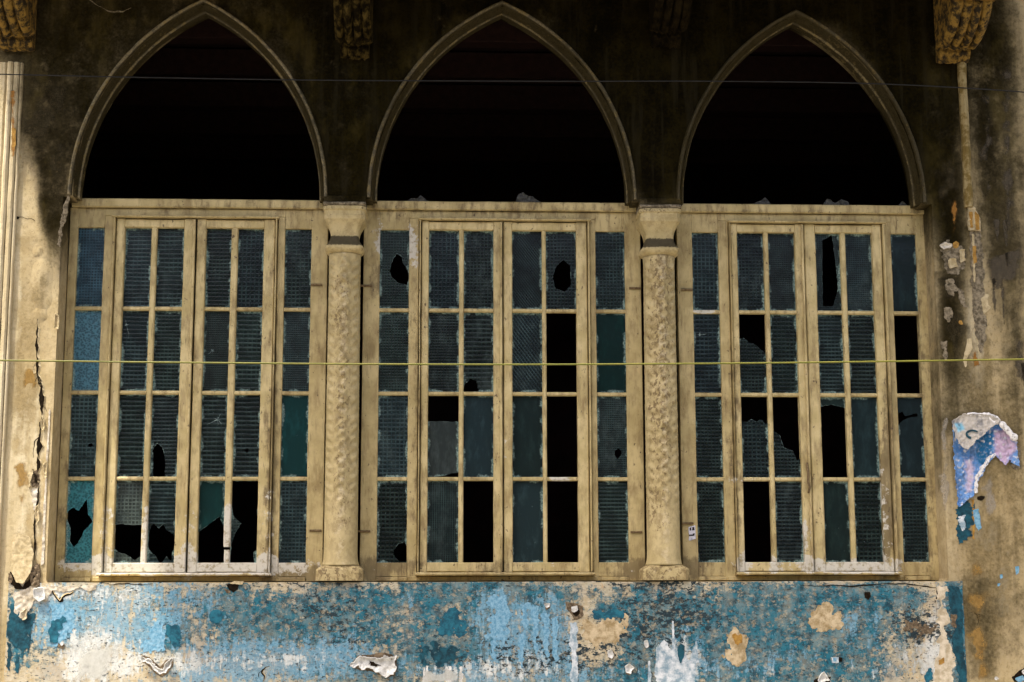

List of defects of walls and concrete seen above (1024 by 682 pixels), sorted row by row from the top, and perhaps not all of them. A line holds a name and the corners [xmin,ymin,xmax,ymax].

leakage [988,169,1023,317]
spalling [939,206,990,367]
crack [33,319,46,474]
peeling [140,620,182,677]
peeling [349,652,397,678]
peeling [418,606,468,667]
peeling [484,594,629,668]
peeling [644,621,699,682]
peeling [808,601,844,632]
peeling [814,657,842,682]
peeling [903,586,967,682]
spalling [1012,668,1024,682]